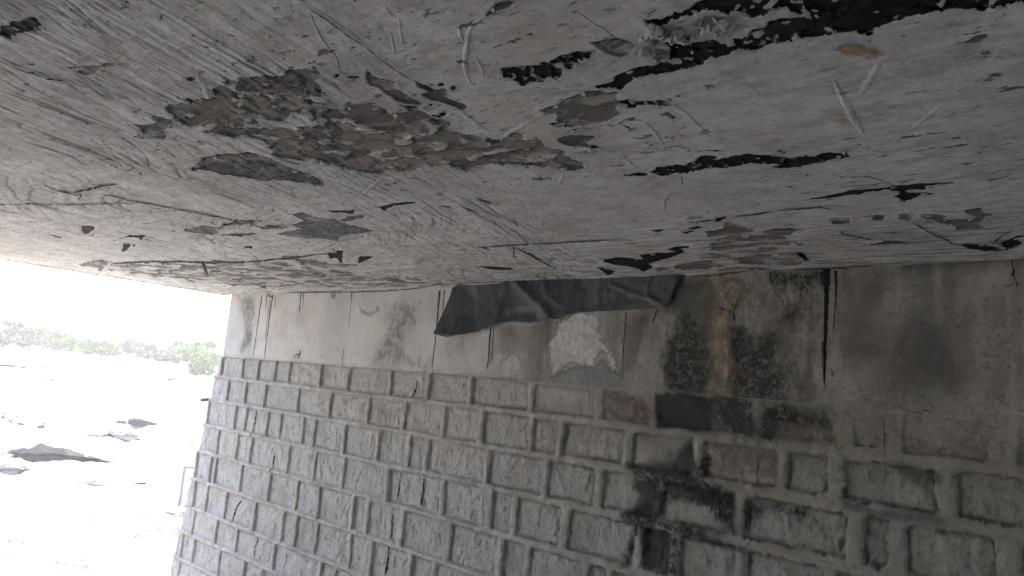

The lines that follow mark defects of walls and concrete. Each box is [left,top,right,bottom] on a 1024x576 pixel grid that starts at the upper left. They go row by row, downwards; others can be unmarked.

peeling [132,0,1024,187]
peeling [809,182,994,231]
peeling [80,210,444,289]
peeling [596,216,810,275]
peeling [960,240,1022,251]
water stain [769,270,822,292]
water stain [621,277,832,576]